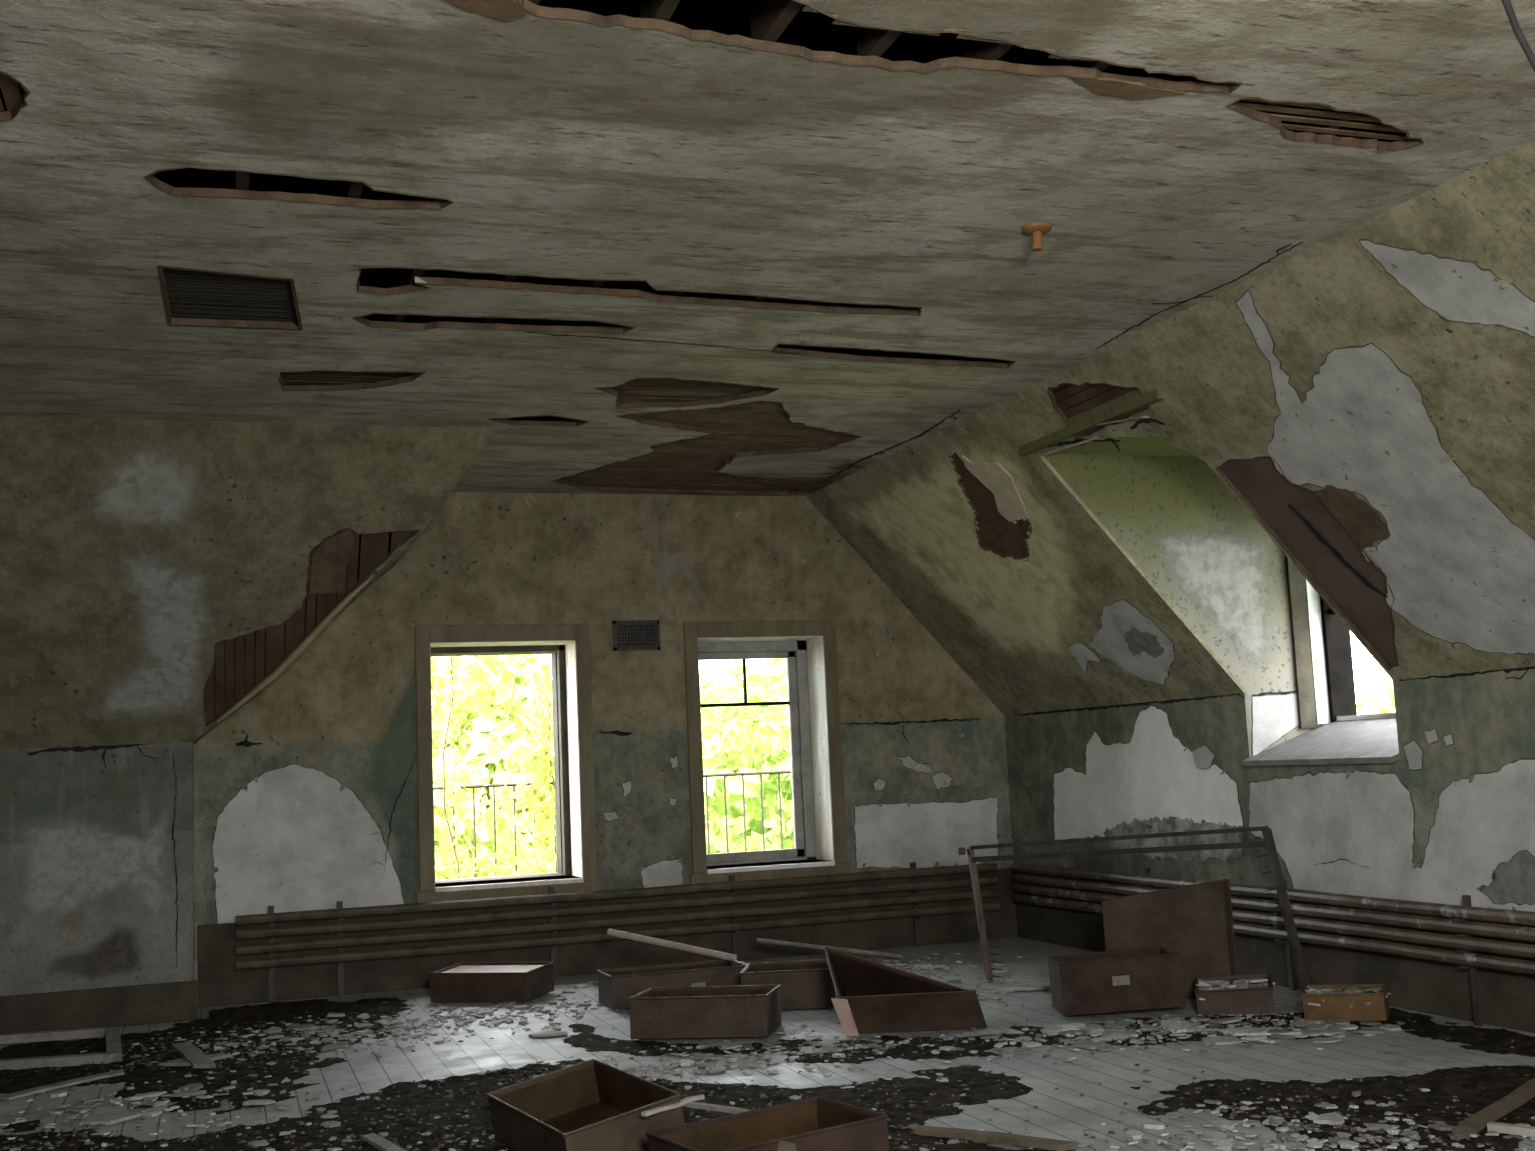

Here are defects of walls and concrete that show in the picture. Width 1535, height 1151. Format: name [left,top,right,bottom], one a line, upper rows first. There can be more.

peeling [1359,239,1535,337]
spalling [1047,382,1150,446]
spalling [949,452,1032,561]
peeling [1215,289,1535,670]
spalling [203,527,421,727]
peeling [1066,598,1175,685]
peeling [1251,693,1299,756]
crack [28,744,178,968]
peeling [212,763,404,924]
peeling [854,755,999,869]
peeling [1053,705,1535,912]